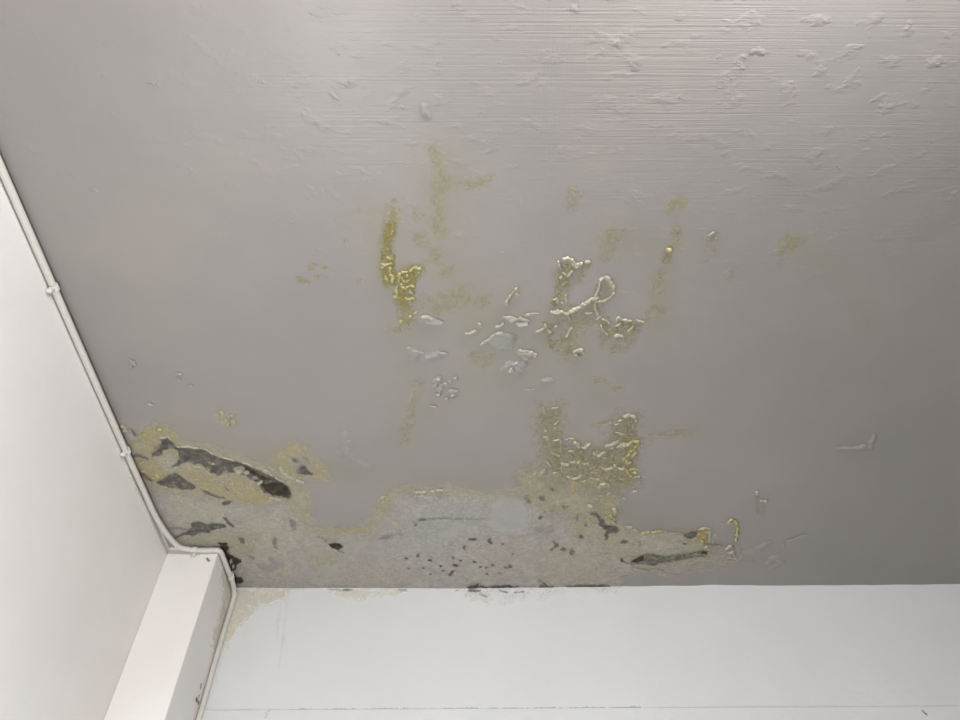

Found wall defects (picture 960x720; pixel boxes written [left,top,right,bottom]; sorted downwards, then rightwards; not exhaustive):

peeling [465,312,539,352]
leakage [554,262,638,360]
spalling [120,425,312,506]
spalling [169,518,234,538]
leakage [127,404,694,649]
spalling [577,512,628,544]
spalling [218,543,243,585]
spalling [621,530,708,571]